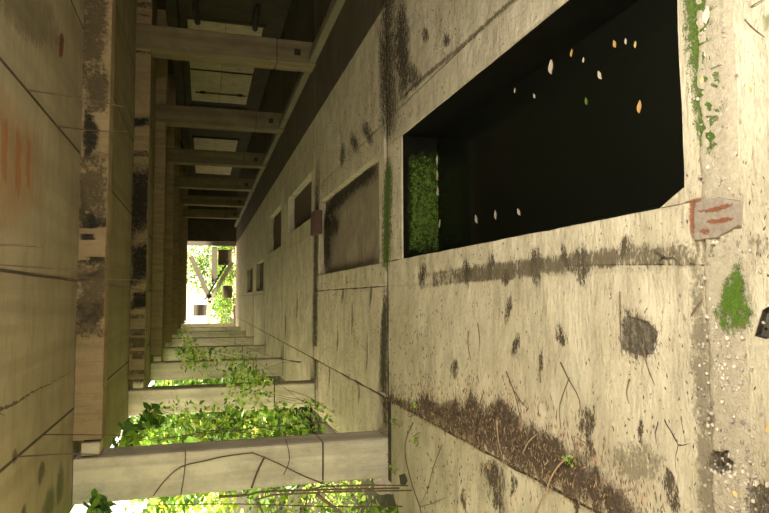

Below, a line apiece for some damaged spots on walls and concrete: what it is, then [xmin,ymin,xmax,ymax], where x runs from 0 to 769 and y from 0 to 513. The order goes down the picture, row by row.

damp [378,0,422,133]
damp [79,0,109,240]
damp [340,121,373,168]
corrosion [689,198,732,234]
damp [561,243,588,286]
damp [76,248,106,337]
spalling [751,307,769,339]
crack [0,374,66,416]
damp [663,467,680,513]
spalling [745,480,769,513]